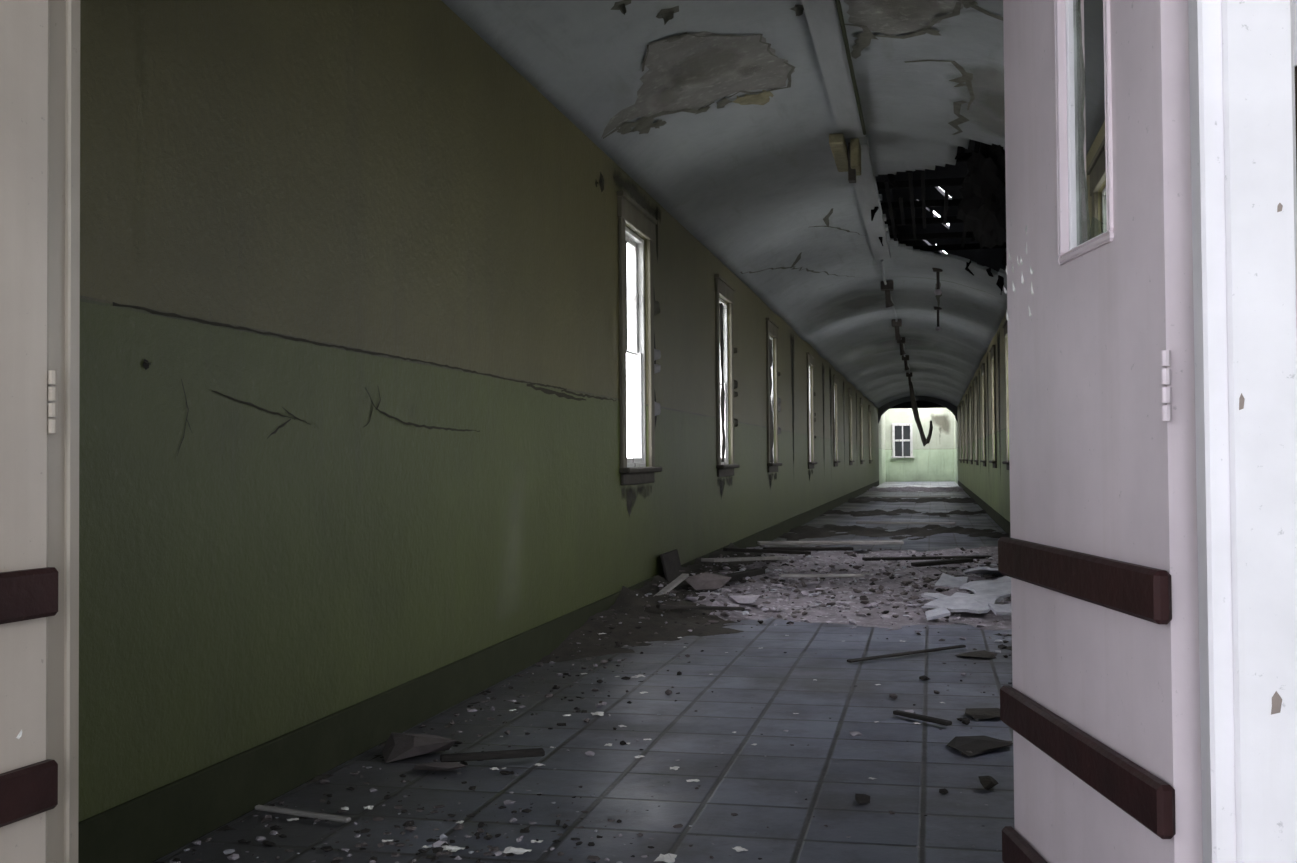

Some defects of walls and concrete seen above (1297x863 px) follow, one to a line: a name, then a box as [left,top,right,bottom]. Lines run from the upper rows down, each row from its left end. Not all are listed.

peeling [601,6,795,139]
peeling [844,0,1003,59]
crack [177,379,311,455]
crack [113,302,616,432]